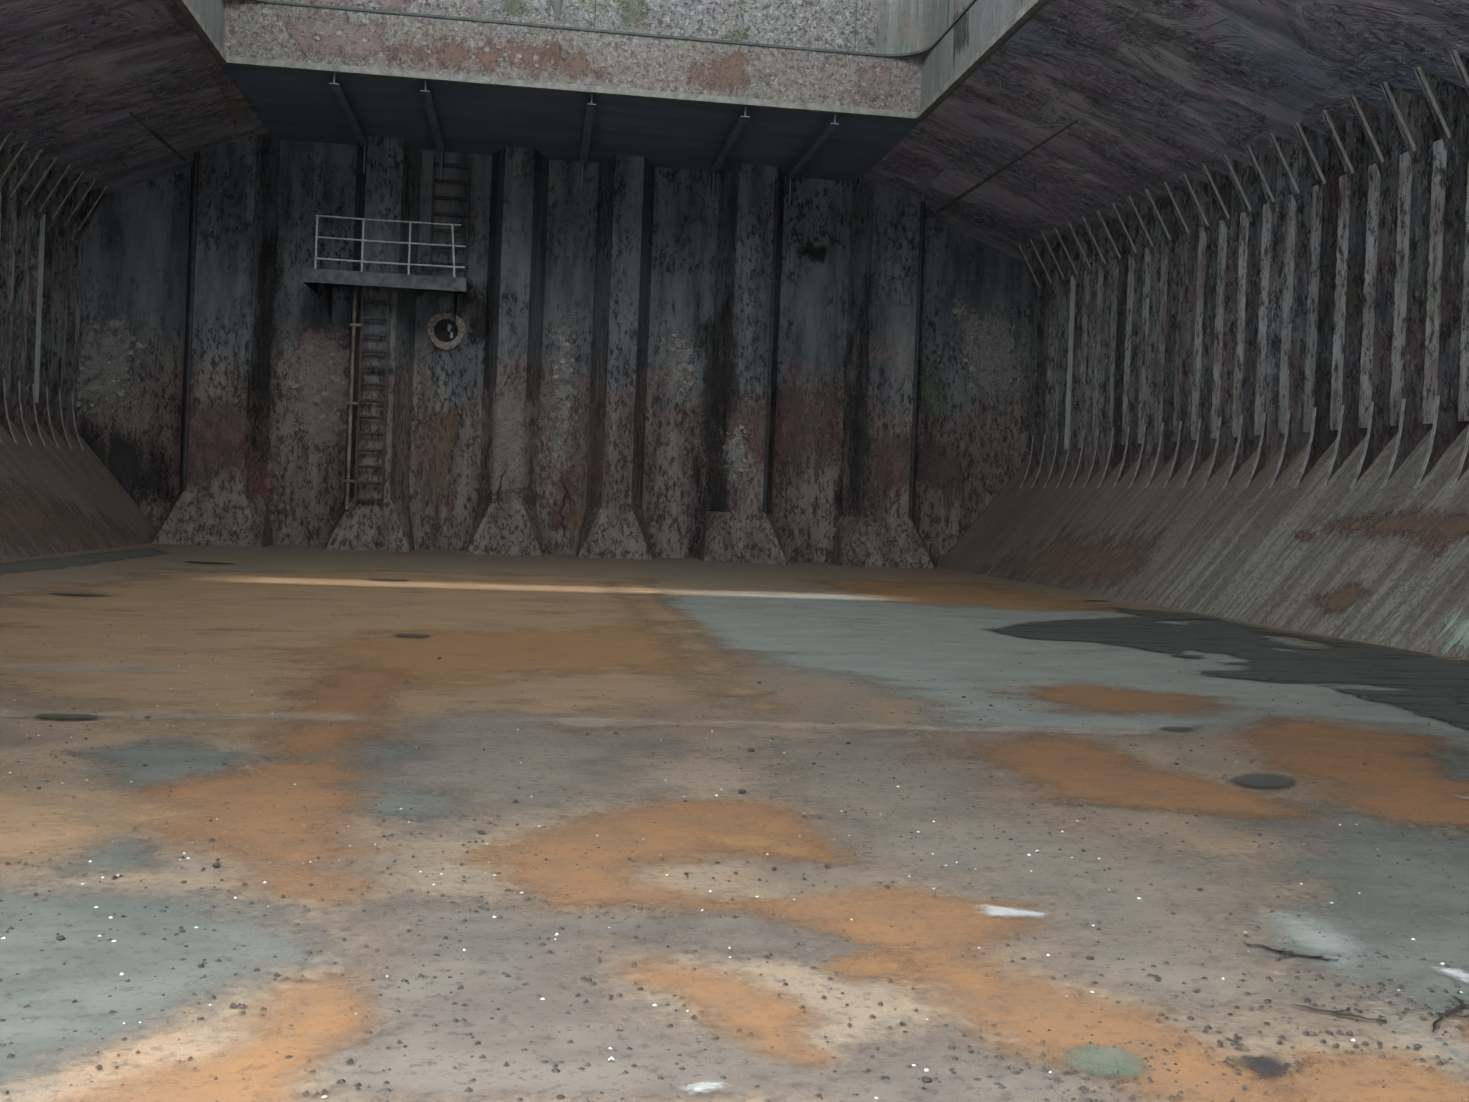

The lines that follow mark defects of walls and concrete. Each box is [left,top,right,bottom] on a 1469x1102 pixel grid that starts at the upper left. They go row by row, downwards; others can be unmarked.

corrosion [388,33,604,79]
corrosion [688,50,752,95]
corrosion [0,570,753,901]
water stain [606,583,1469,1032]
corrosion [996,684,1226,716]
corrosion [1243,717,1469,825]